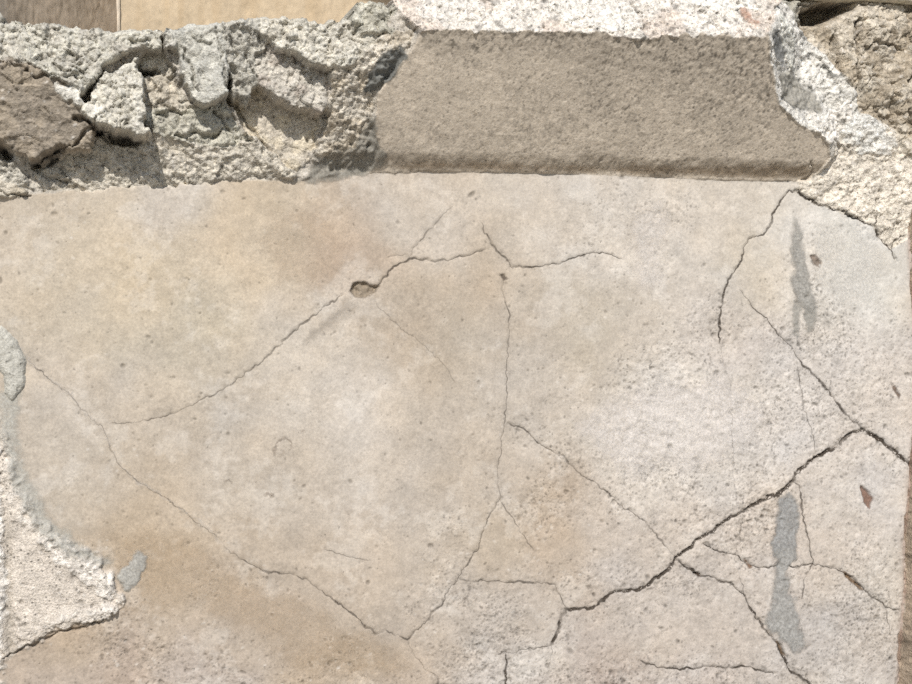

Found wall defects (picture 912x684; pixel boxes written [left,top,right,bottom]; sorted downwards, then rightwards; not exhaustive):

spalling [391,0,912,250]
crack [527,252,618,268]
crack [718,190,902,341]
spalling [0,414,126,684]
crack [539,307,907,684]